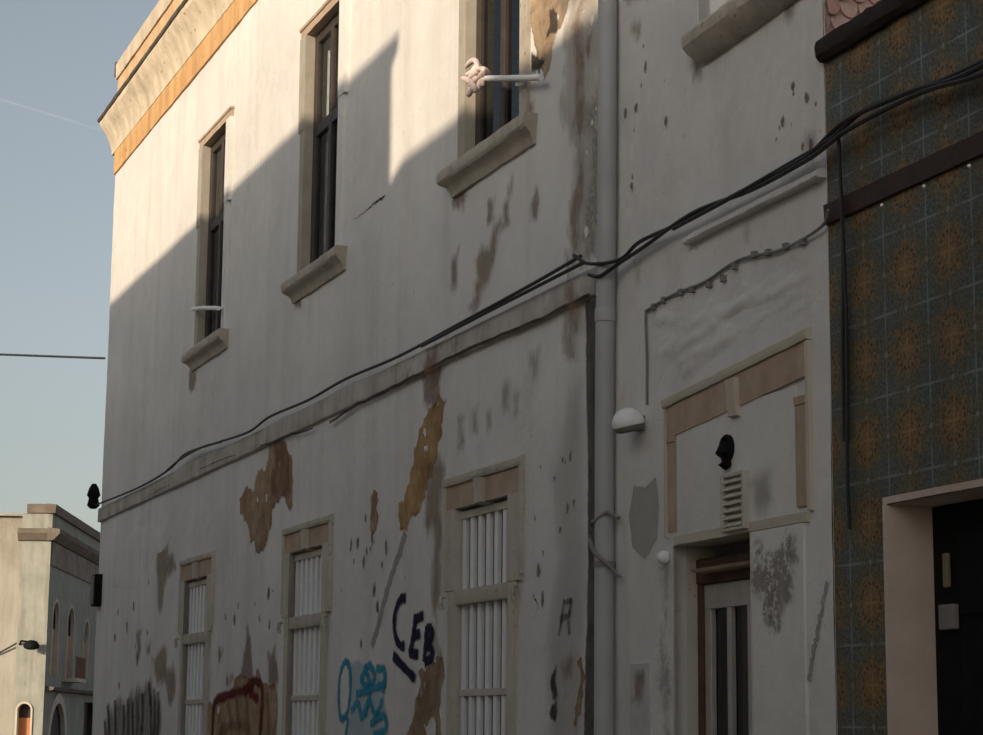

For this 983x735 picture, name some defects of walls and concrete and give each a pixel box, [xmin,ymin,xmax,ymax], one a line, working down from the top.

spalling [530,0,570,80]
spalling [398,368,447,532]
spalling [239,439,293,554]
spalling [350,488,379,568]
spalling [207,669,278,735]
spalling [406,654,445,735]